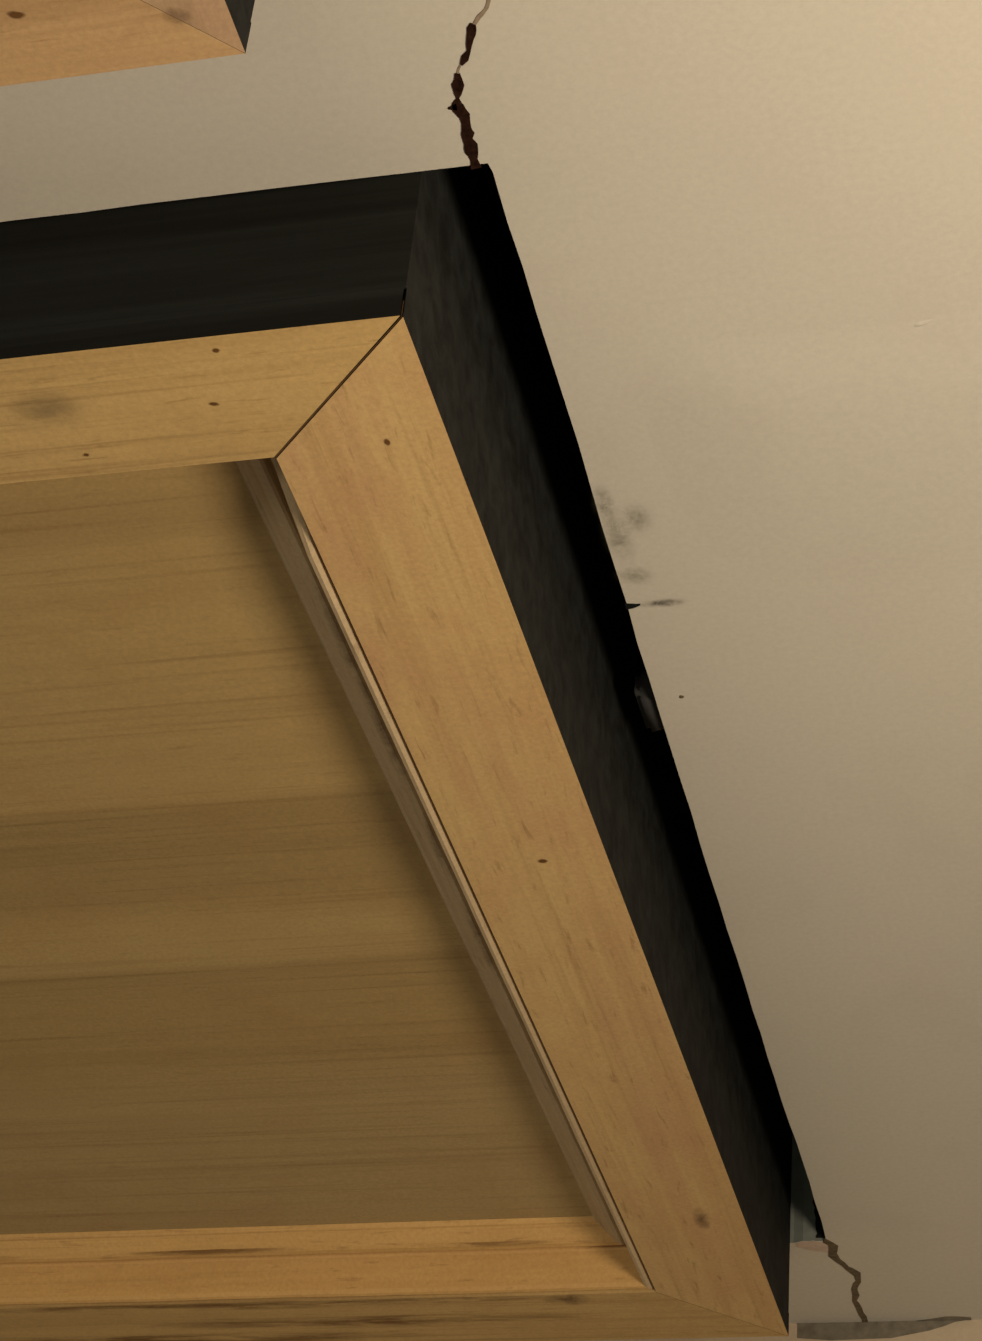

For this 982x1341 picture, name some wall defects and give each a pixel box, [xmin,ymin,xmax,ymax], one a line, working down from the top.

crack [448,0,491,169]
crack [797,1199,971,1340]